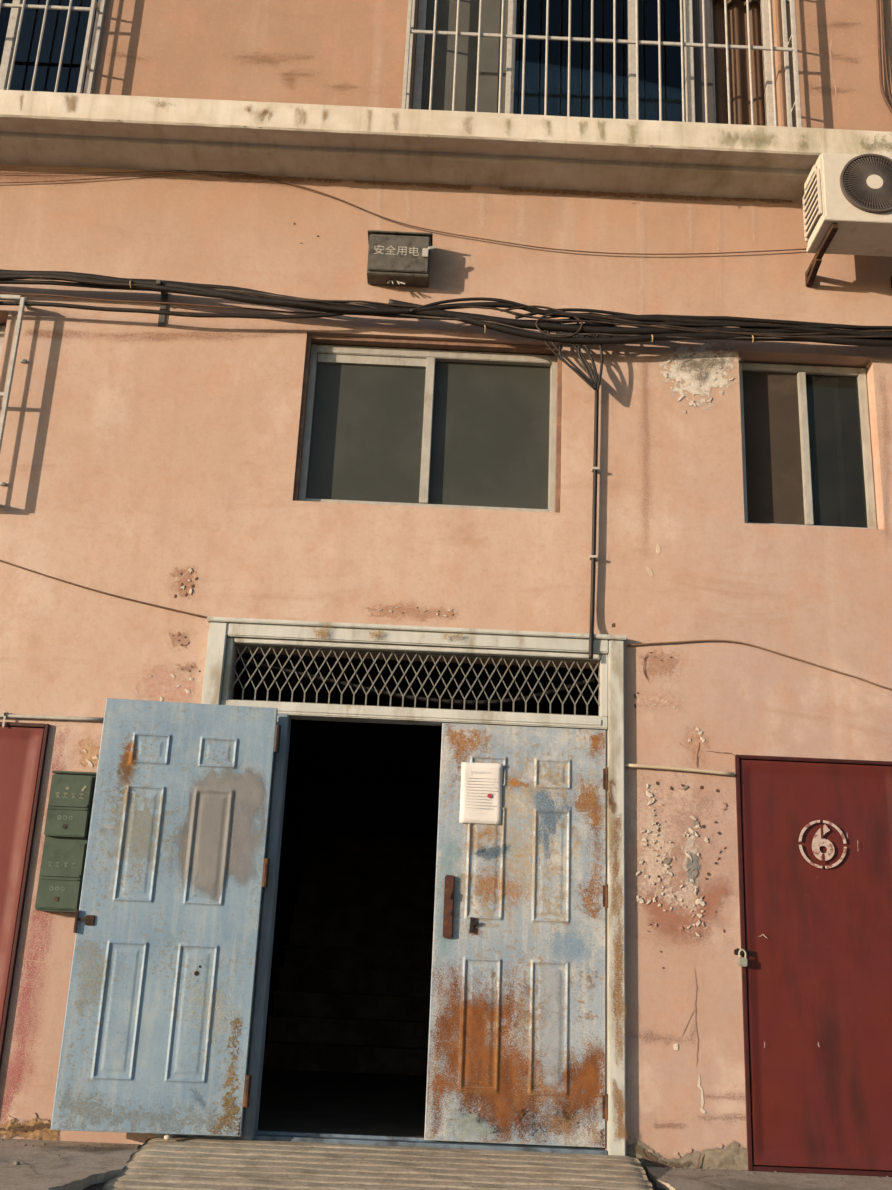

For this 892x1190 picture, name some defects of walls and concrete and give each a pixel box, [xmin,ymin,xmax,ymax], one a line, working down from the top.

damp [578,119,607,140]
damp [714,126,781,151]
damp [856,133,892,155]
peeling [658,340,741,413]
spalling [170,565,201,599]
rust [115,735,138,790]
peeling [627,727,739,969]
rust [425,723,628,1147]
crack [682,968,699,1067]
rust [208,1018,243,1135]